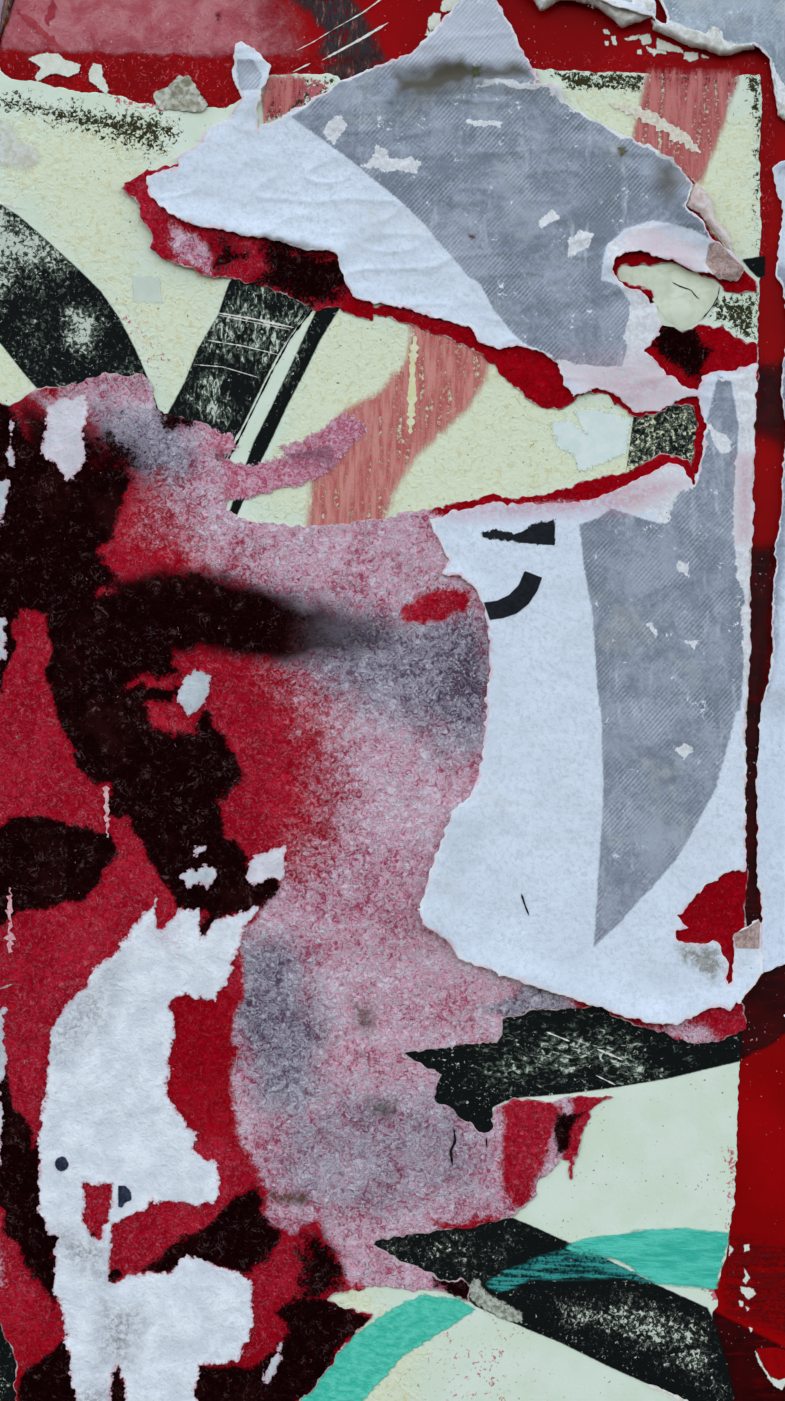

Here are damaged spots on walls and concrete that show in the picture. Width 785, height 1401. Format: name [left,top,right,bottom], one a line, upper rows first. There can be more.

peeling [603,29,709,62]
peeling [153,75,208,113]